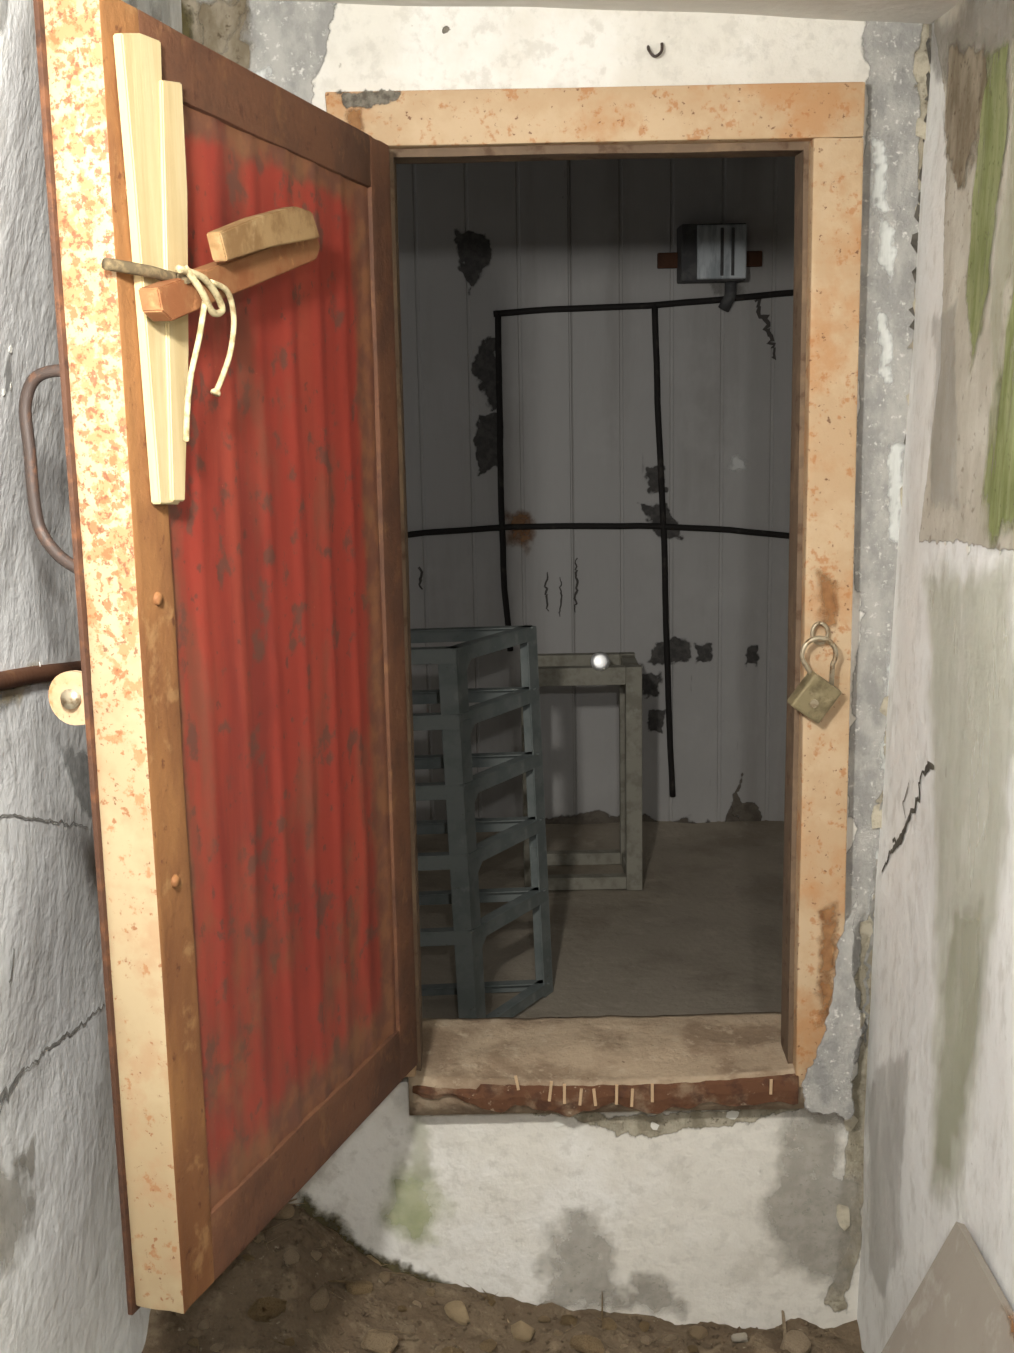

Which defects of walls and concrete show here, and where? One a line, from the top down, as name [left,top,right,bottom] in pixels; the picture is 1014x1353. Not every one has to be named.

damp [0,0,8,31]
flaking render [181,0,337,104]
damp [944,42,1009,359]
peeling [454,229,492,294]
peeling [471,337,504,476]
flaking render [824,0,1014,1312]
crack [882,761,934,872]
crack [0,1004,104,1113]
damp [0,1139,34,1266]
damp [768,1112,857,1284]
damp [544,1212,683,1312]